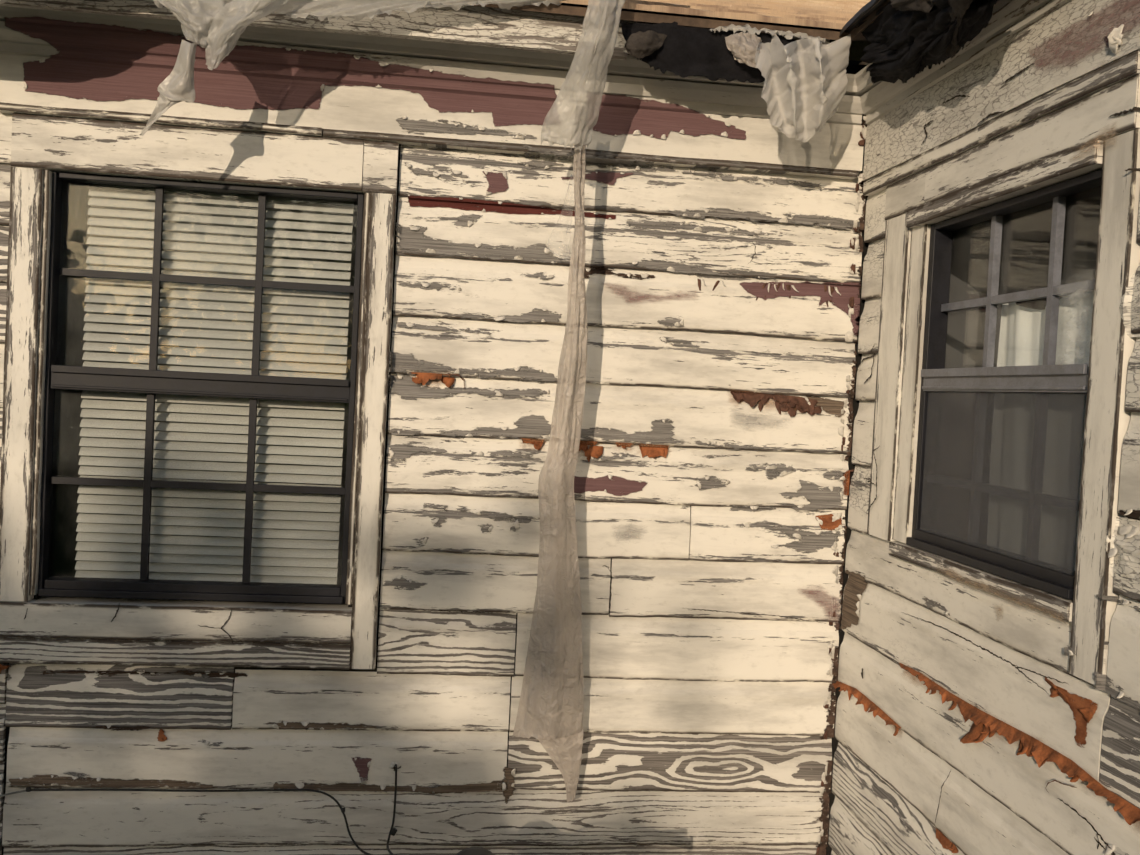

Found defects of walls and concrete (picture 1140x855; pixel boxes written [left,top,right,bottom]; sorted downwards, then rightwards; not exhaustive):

crack [1003,63,1034,84]
peeling [4,16,823,191]
crack [858,115,867,146]
crack [921,94,1004,145]
crack [1108,107,1140,118]
peeling [408,170,853,236]
peeling [396,223,563,280]
peeling [584,258,861,335]
peeling [388,352,558,400]
peeling [389,415,551,463]
peeling [574,418,845,553]
crack [693,173,878,855]